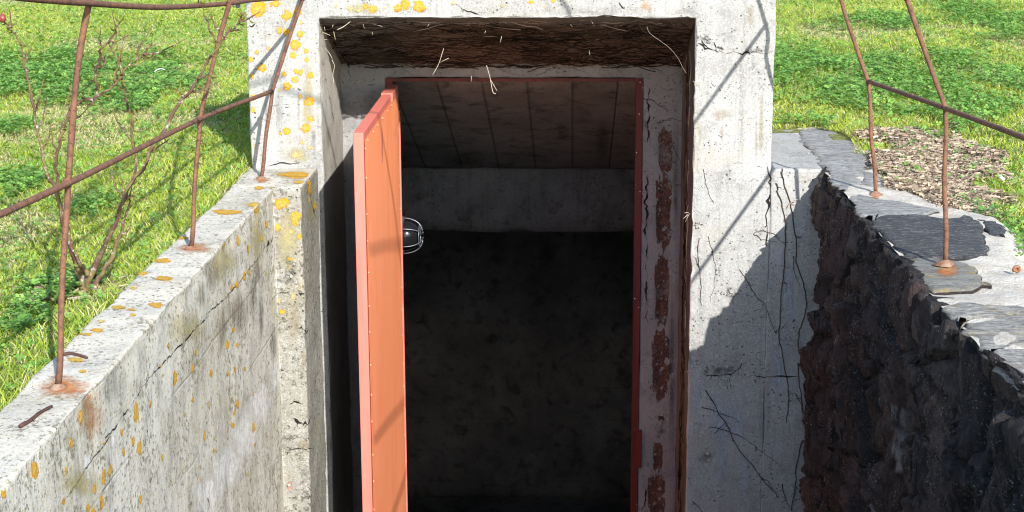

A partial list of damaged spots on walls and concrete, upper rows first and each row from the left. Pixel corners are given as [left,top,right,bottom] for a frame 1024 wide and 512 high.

crack [699,41,763,55]
crack [64,237,273,501]
crack [702,362,798,388]
rust [45,376,93,415]